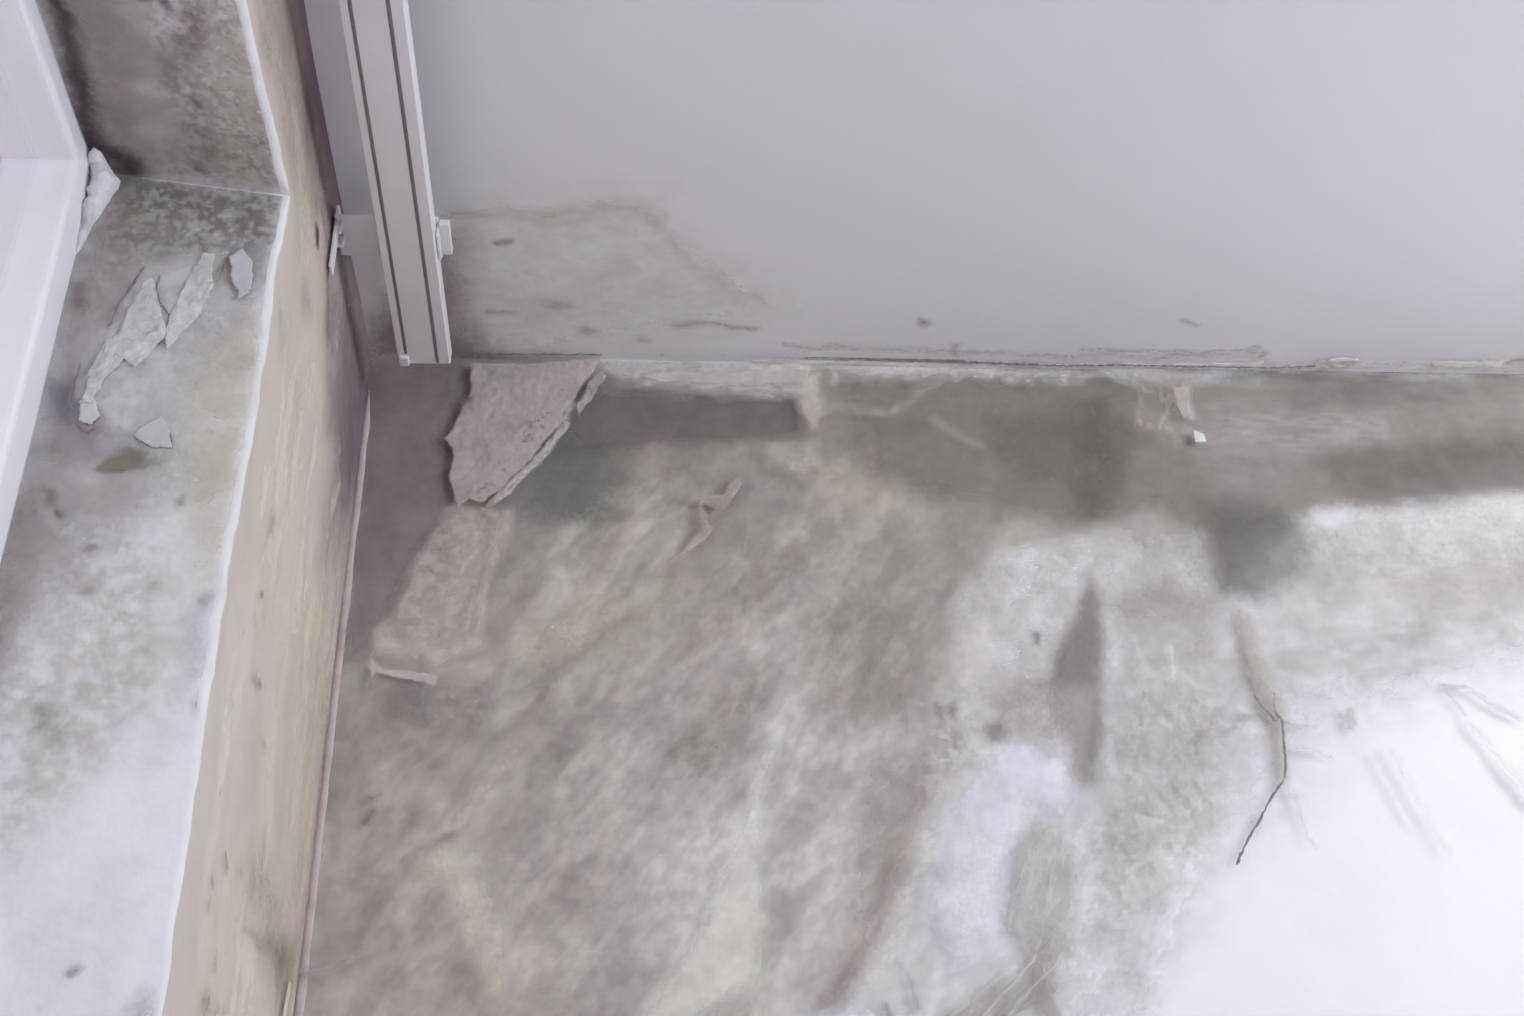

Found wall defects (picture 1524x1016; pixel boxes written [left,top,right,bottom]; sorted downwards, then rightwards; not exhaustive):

damp [262,0,344,238]
damp [0,0,281,615]
peeling [71,236,253,471]
peeling [624,365,818,416]
peeling [368,361,606,720]
damp [300,217,1524,1016]
crack [1236,611,1288,865]